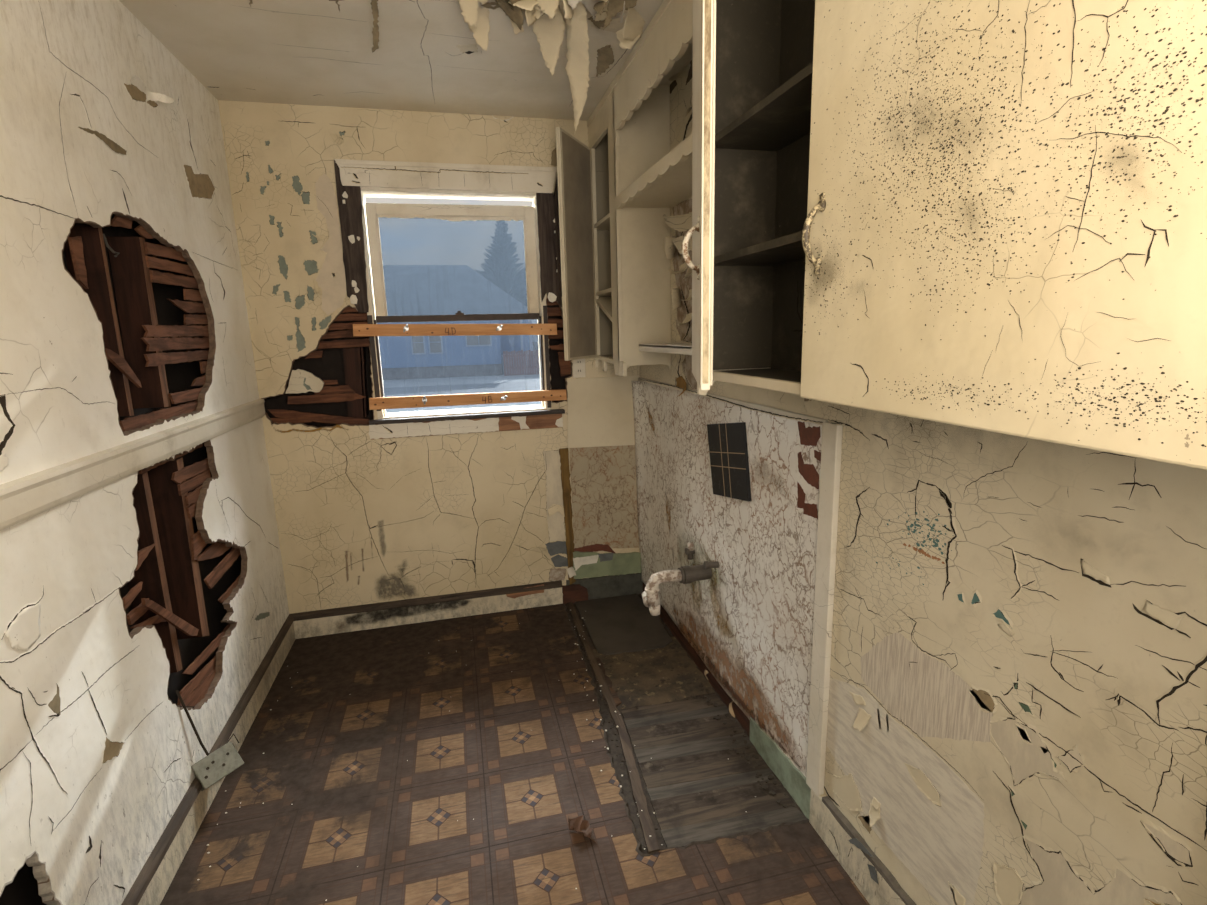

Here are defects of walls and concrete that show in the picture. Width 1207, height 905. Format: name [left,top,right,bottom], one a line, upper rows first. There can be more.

hole [62,212,216,436]
flaking render [119,440,248,710]
flaking render [244,163,374,428]
damp [347,564,469,624]
peeling [456,0,645,135]
crack [639,280,1028,600]
mould [804,0,1207,341]
mould [873,352,1207,447]
crack [956,0,1182,280]
crack [834,588,1044,883]
peeling [827,633,1088,905]
crack [987,581,1207,886]